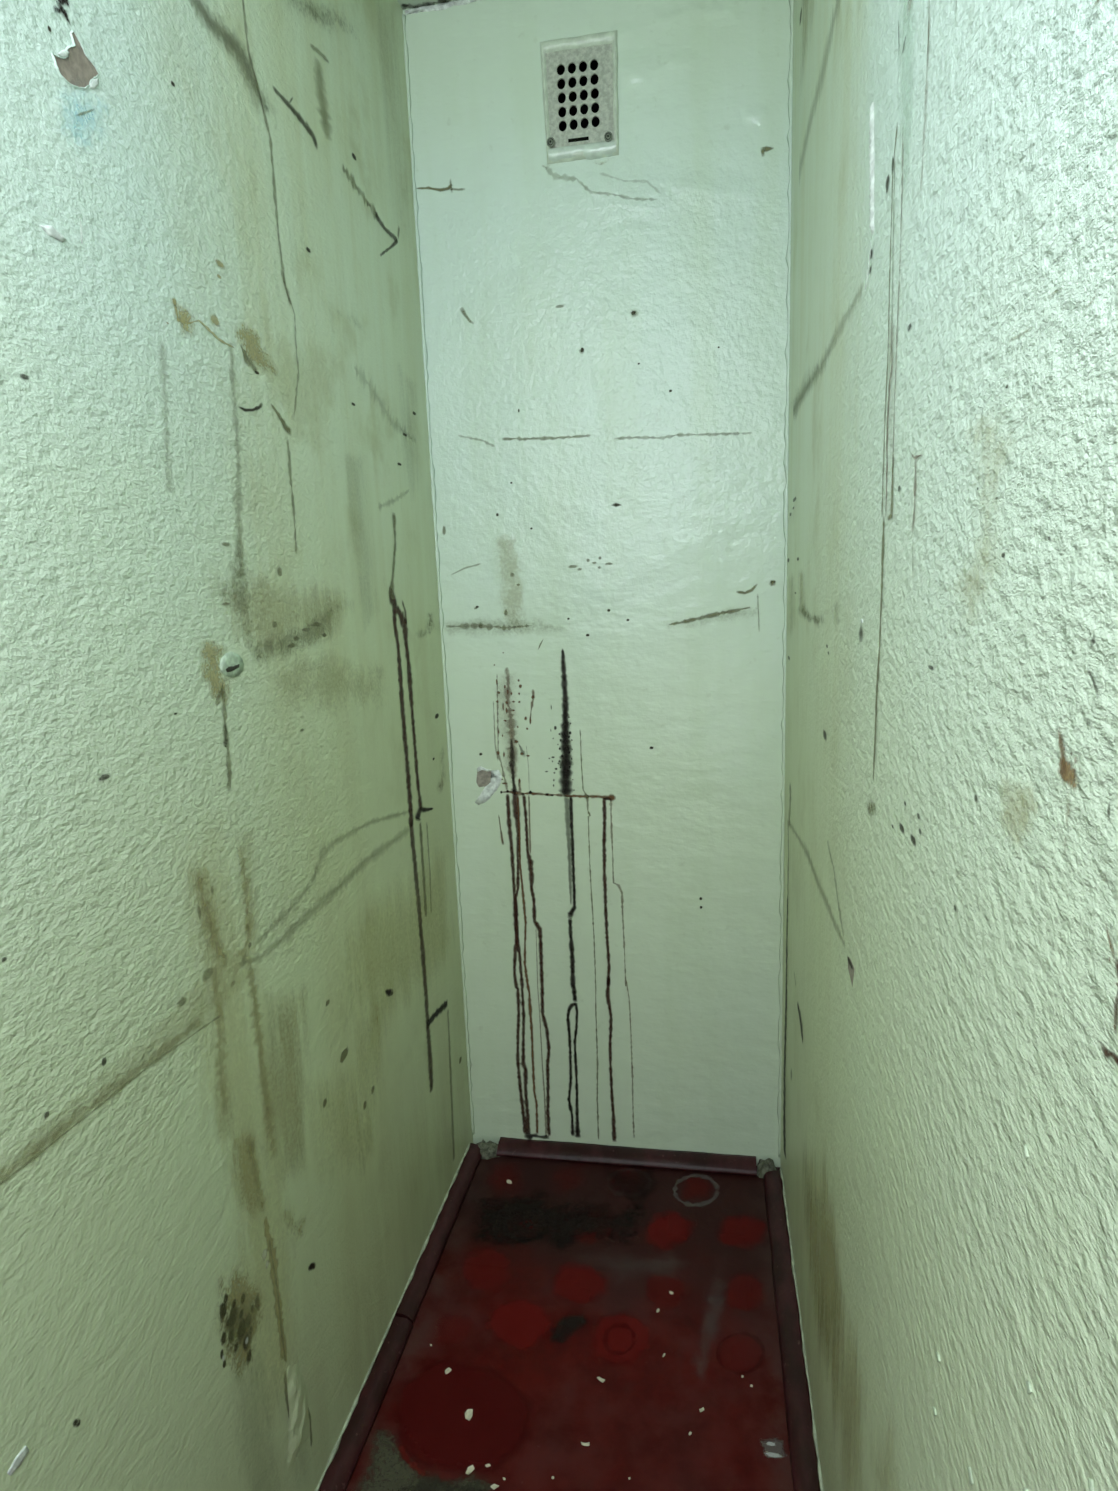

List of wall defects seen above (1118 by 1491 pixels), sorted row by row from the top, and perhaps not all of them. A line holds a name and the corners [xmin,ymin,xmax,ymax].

peeling [51,0,100,90]
corrosion [494,652,535,790]
corrosion [1058,736,1080,788]
damp [220,1272,261,1372]